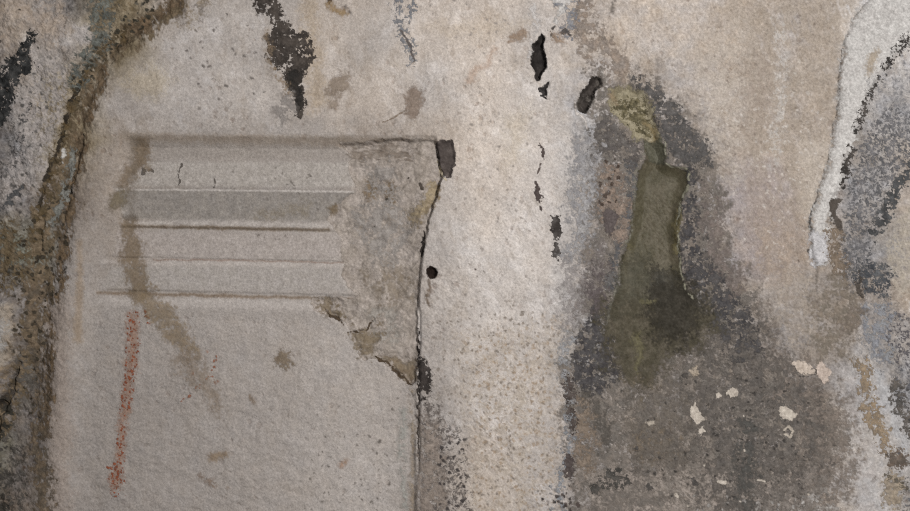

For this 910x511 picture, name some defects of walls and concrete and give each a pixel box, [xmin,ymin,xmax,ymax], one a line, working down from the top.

leakage [252,0,316,123]
leakage [508,29,527,43]
leakage [0,0,184,511]
leakage [120,216,200,360]
spalling [311,138,456,385]
leakage [534,0,910,511]